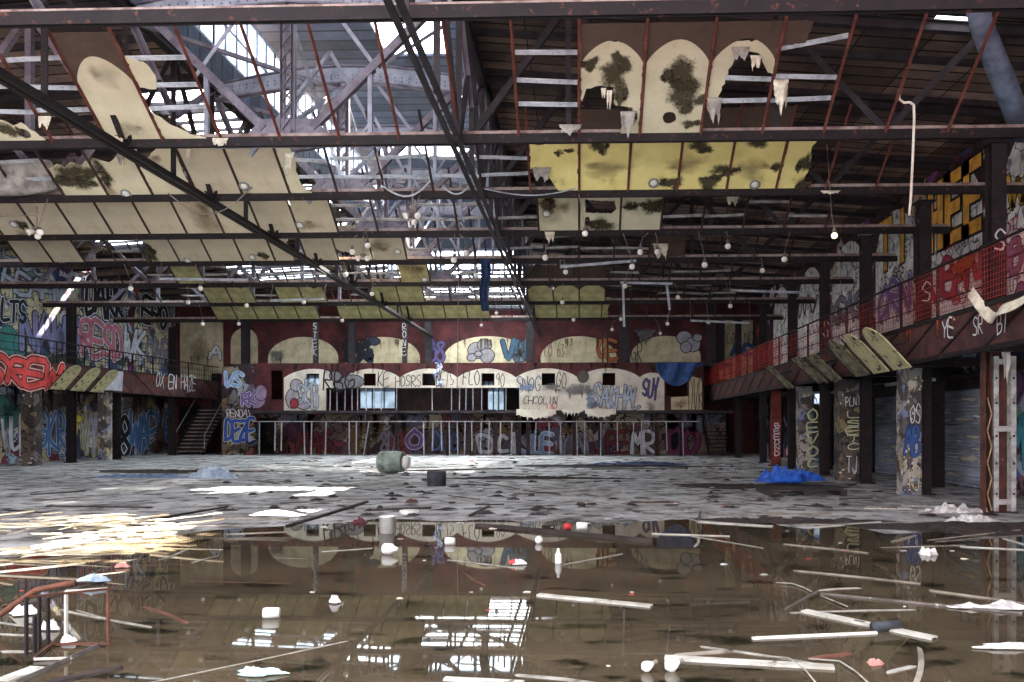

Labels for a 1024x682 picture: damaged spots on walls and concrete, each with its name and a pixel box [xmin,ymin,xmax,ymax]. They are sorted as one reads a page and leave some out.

leakage [581,51,637,122]
leakage [661,56,708,129]
leakage [689,142,713,154]
leakage [54,158,113,189]
leakage [659,176,683,190]
leakage [699,165,742,190]
leakage [770,155,812,189]